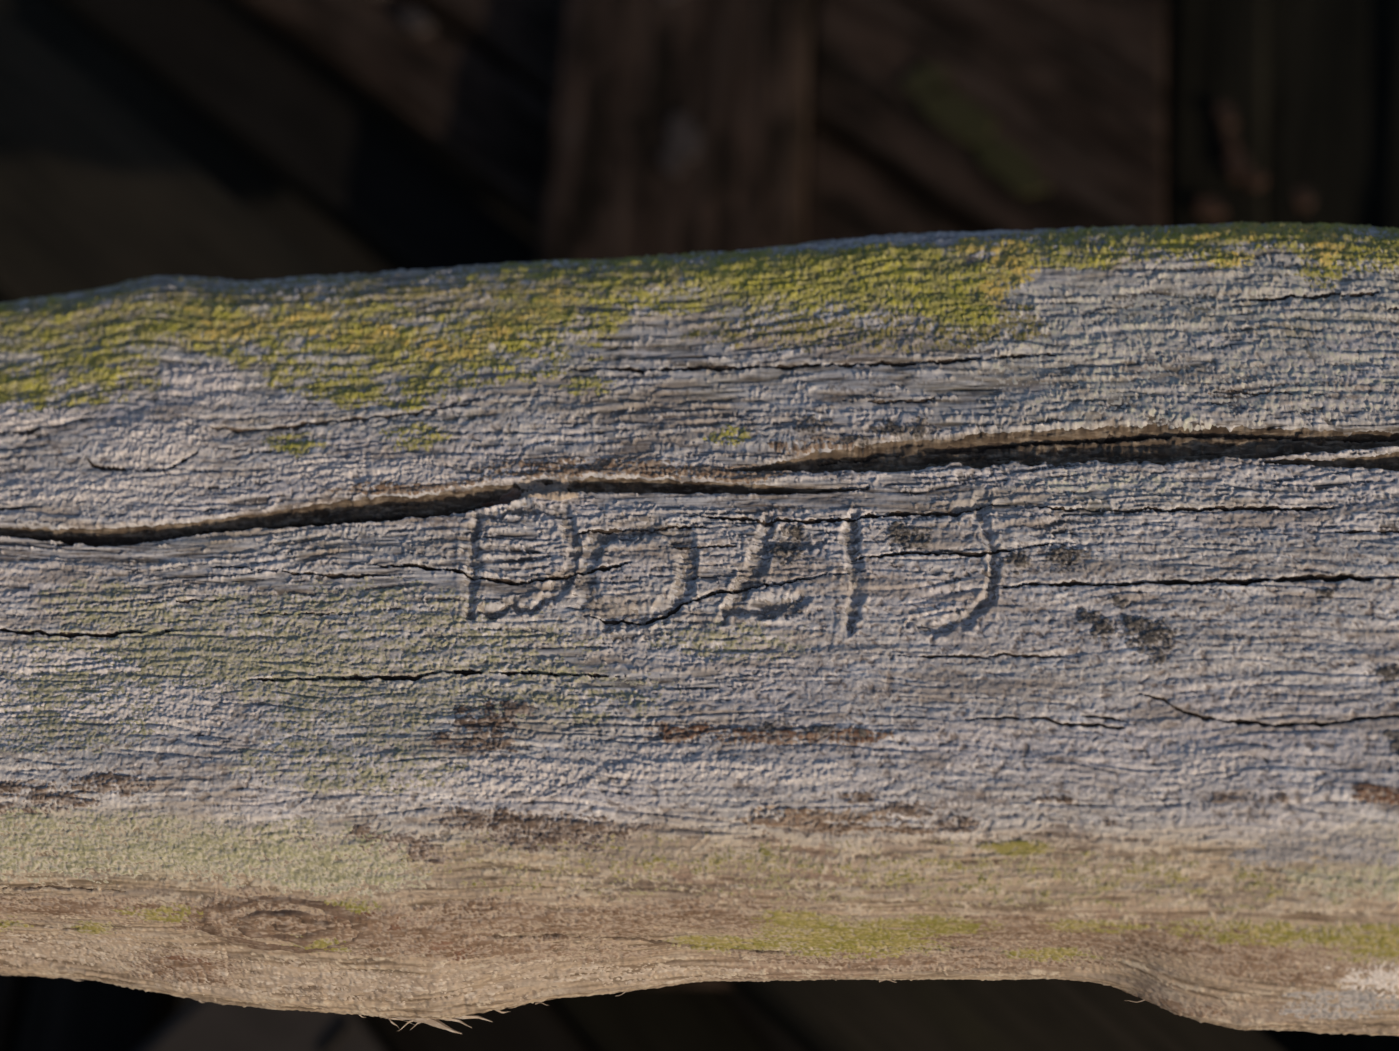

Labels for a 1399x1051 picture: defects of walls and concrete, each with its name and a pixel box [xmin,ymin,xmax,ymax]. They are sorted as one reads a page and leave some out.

crack [545,353,1060,405]
crack [0,390,1399,638]
crack [966,693,1399,730]